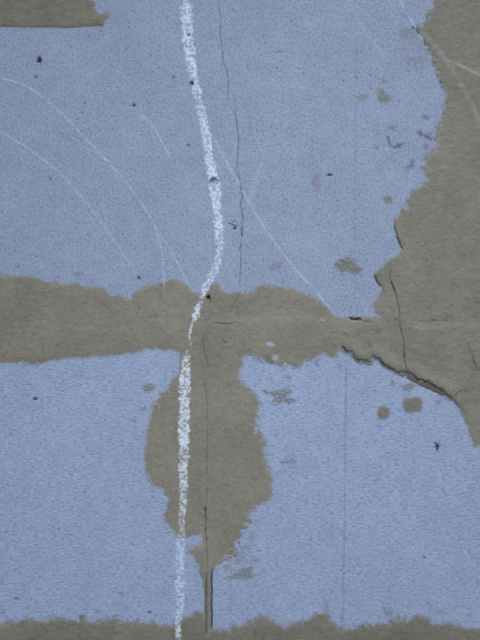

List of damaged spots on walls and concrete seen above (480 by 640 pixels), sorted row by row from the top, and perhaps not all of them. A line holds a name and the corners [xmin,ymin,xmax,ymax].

peeling [342,0,480,447]